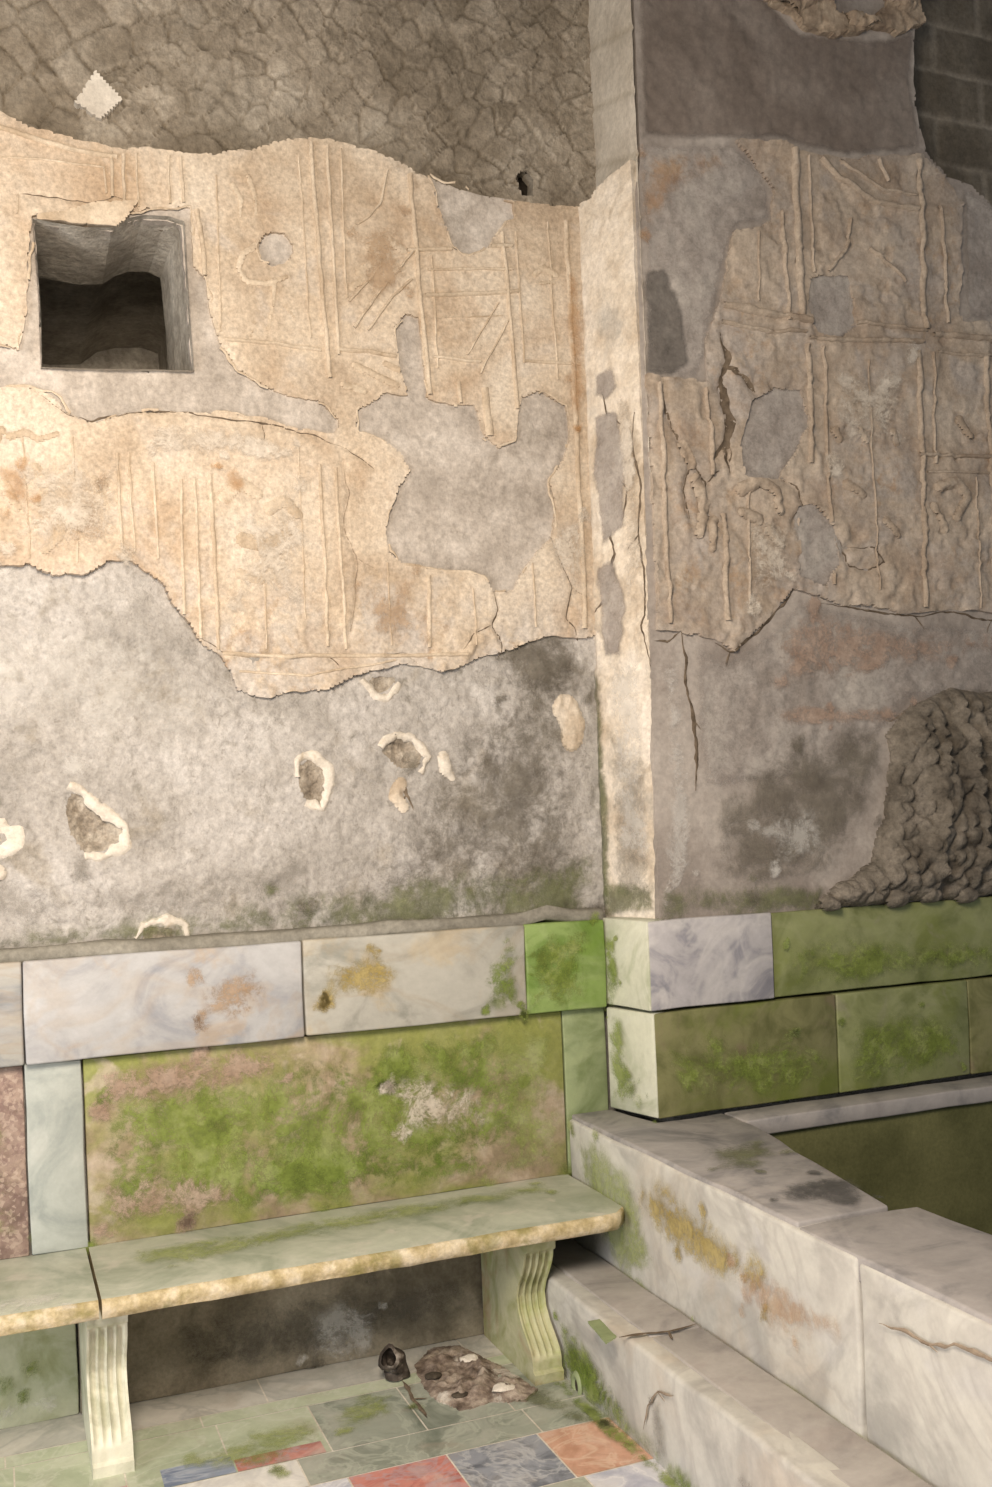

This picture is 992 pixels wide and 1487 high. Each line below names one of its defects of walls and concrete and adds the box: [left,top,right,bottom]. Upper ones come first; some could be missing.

flaking render [0,205,338,433]
flaking render [356,315,570,592]
crack [551,539,602,641]
crack [602,333,992,791]
spalling [0,818,25,880]
spalling [65,781,132,862]
spalling [294,750,335,811]
water stain [89,977,293,1120]
water stain [380,1081,481,1140]
water stain [94,1177,231,1237]
water stain [642,1188,767,1320]
crack [879,1323,992,1362]